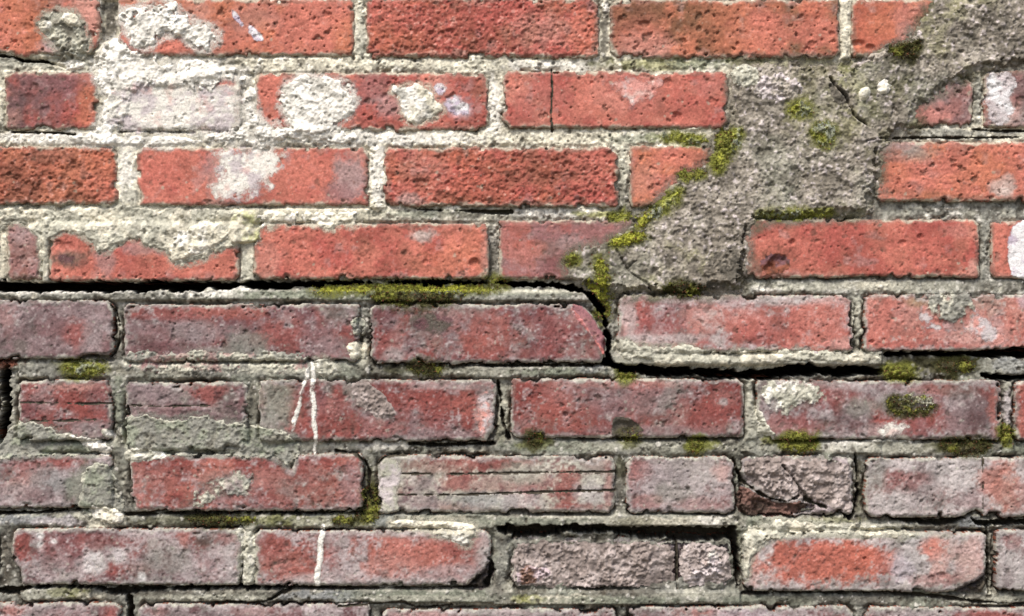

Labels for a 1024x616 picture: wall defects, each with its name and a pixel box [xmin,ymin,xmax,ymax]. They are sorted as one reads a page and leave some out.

water stain [232,11,263,41]
crack [548,68,556,133]
water stain [210,141,284,203]
crack [0,279,1024,521]
water stain [878,422,909,439]
crack [497,457,1024,604]